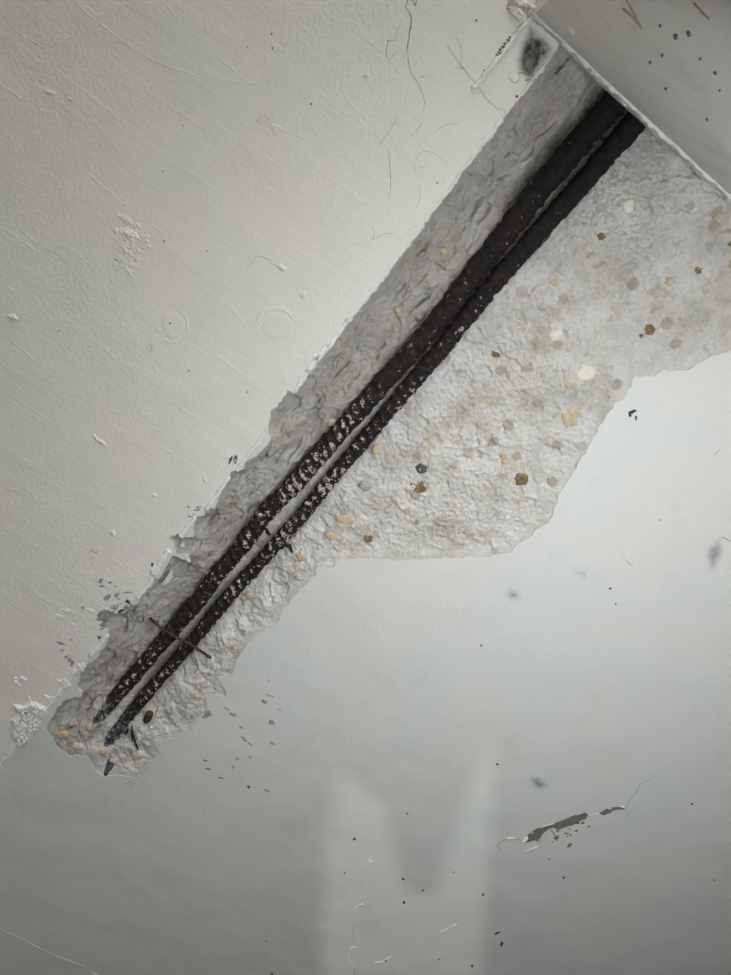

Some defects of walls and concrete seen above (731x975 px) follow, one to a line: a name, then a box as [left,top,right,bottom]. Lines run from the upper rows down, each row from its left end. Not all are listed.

spalling [47,45,731,777]